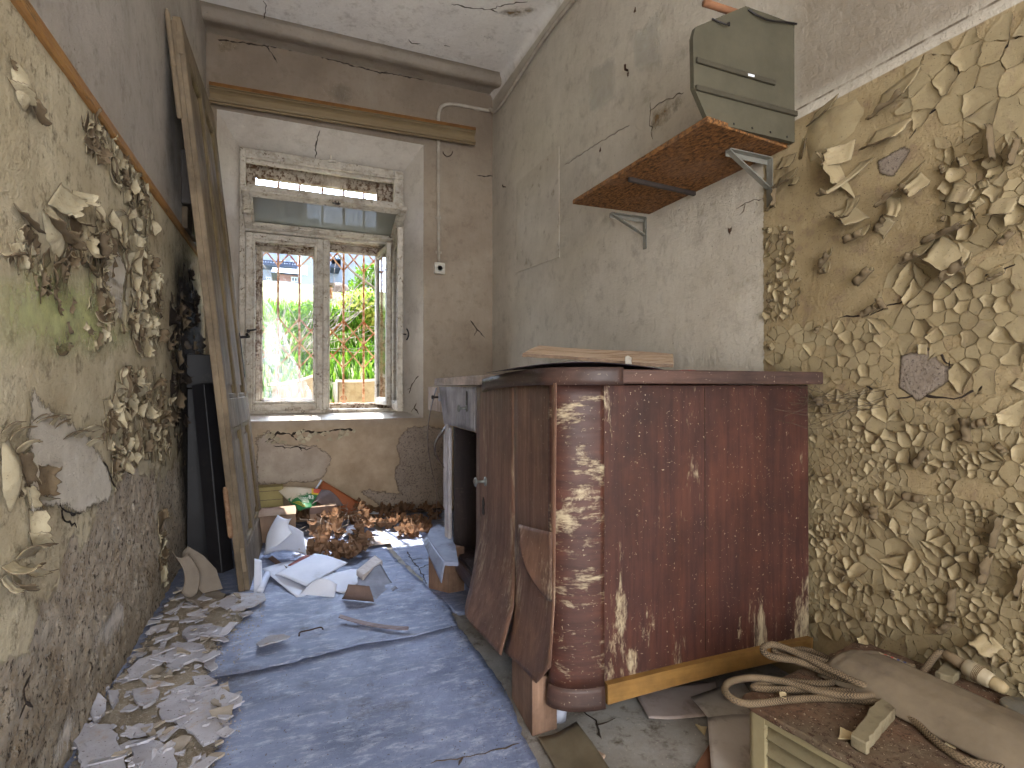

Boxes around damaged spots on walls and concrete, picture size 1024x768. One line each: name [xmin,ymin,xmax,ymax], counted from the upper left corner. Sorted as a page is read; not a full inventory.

crack [452,2,526,12]
peeling [6,56,52,126]
crack [219,39,423,80]
crack [566,92,683,164]
peeling [0,108,207,594]
peeling [762,12,1024,699]
flaking render [255,429,356,485]
flaking render [361,426,445,514]